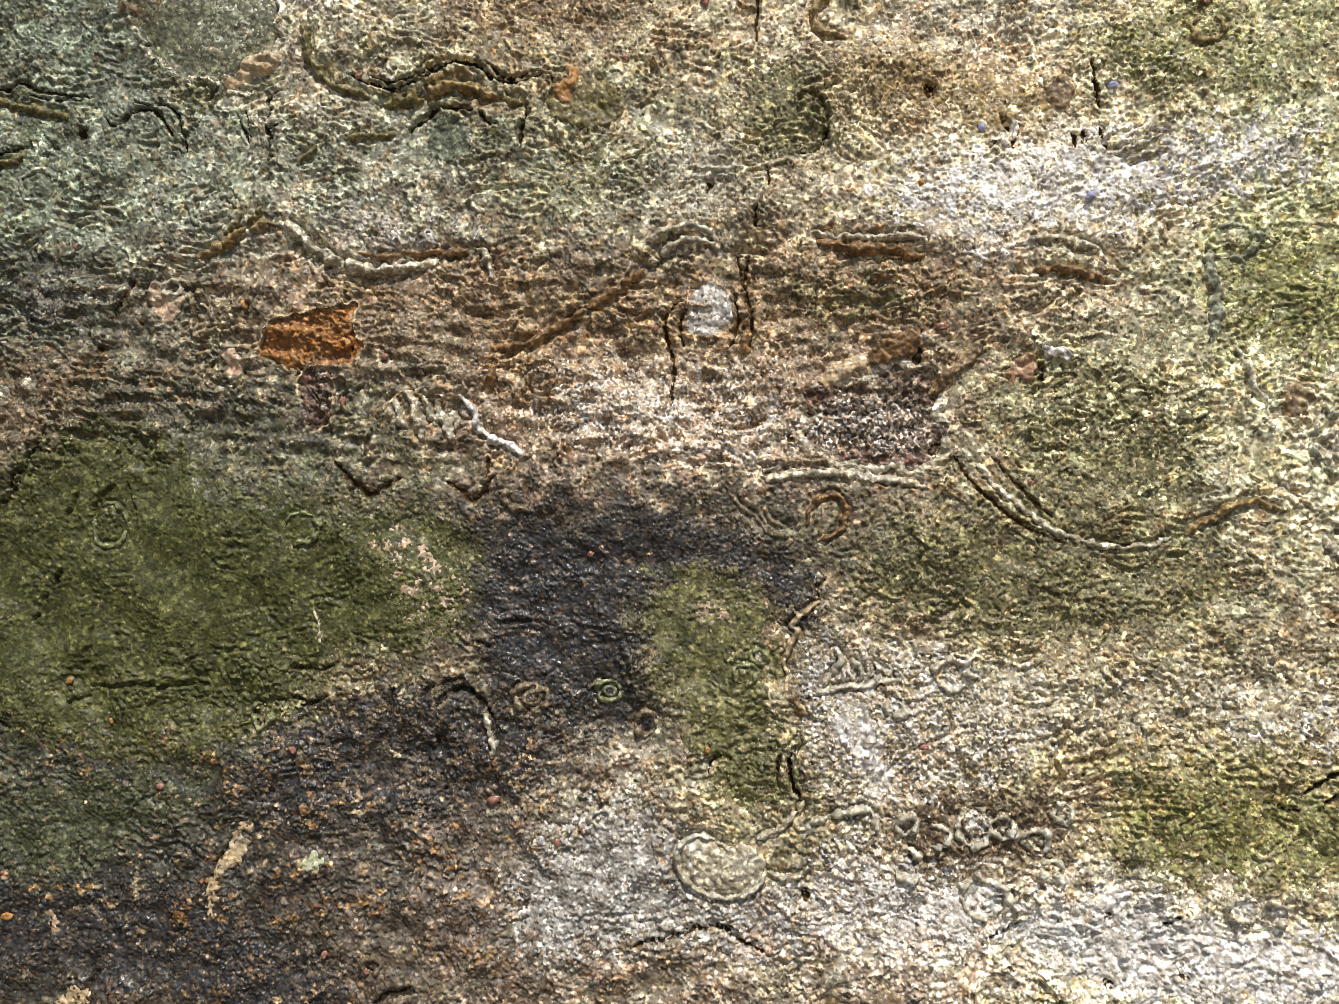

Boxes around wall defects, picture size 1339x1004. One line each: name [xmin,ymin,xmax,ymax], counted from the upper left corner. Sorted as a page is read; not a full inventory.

crack [662,301,689,409]
leakage [508,350,938,475]
leakage [220,483,1339,1004]
leakage [0,867,370,1004]